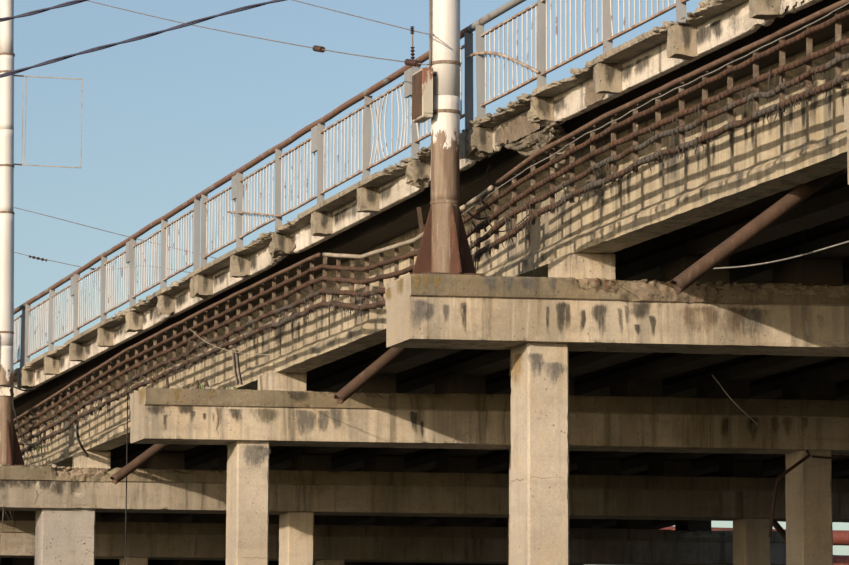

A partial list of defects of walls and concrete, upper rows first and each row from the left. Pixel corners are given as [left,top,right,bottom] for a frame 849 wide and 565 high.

spalling [780,0,803,14]
spalling [497,114,565,160]
water stain [729,113,754,147]
water stain [659,141,715,175]
spalling [566,277,618,287]
spalling [630,280,746,304]
spalling [760,283,849,298]
water stain [546,303,570,329]
water stain [581,305,606,328]
water stain [618,302,656,334]
water stain [531,353,542,372]
water stain [296,409,341,431]